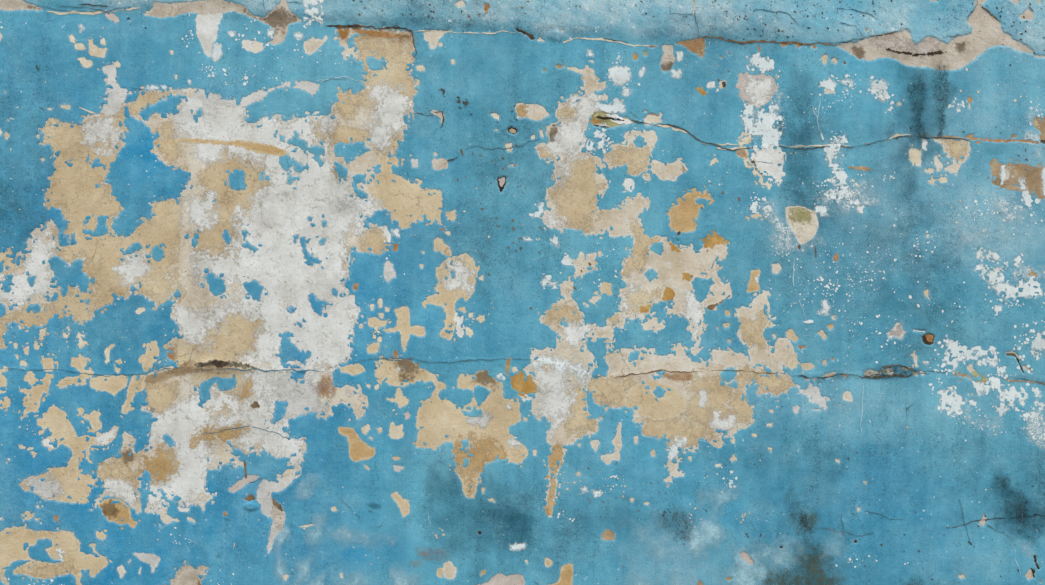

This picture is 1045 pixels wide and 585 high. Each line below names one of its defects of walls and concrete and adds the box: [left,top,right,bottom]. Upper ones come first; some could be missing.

crack [45,3,140,15]
crack [327,24,515,57]
spalling [781,0,1045,113]
leakage [910,66,949,139]
peeling [696,46,873,251]
crack [632,120,968,171]
peeling [0,0,836,585]
crack [595,365,946,379]
peeling [864,310,1045,441]
leakage [1027,417,1045,446]
leakage [663,489,734,554]
leakage [727,546,839,585]